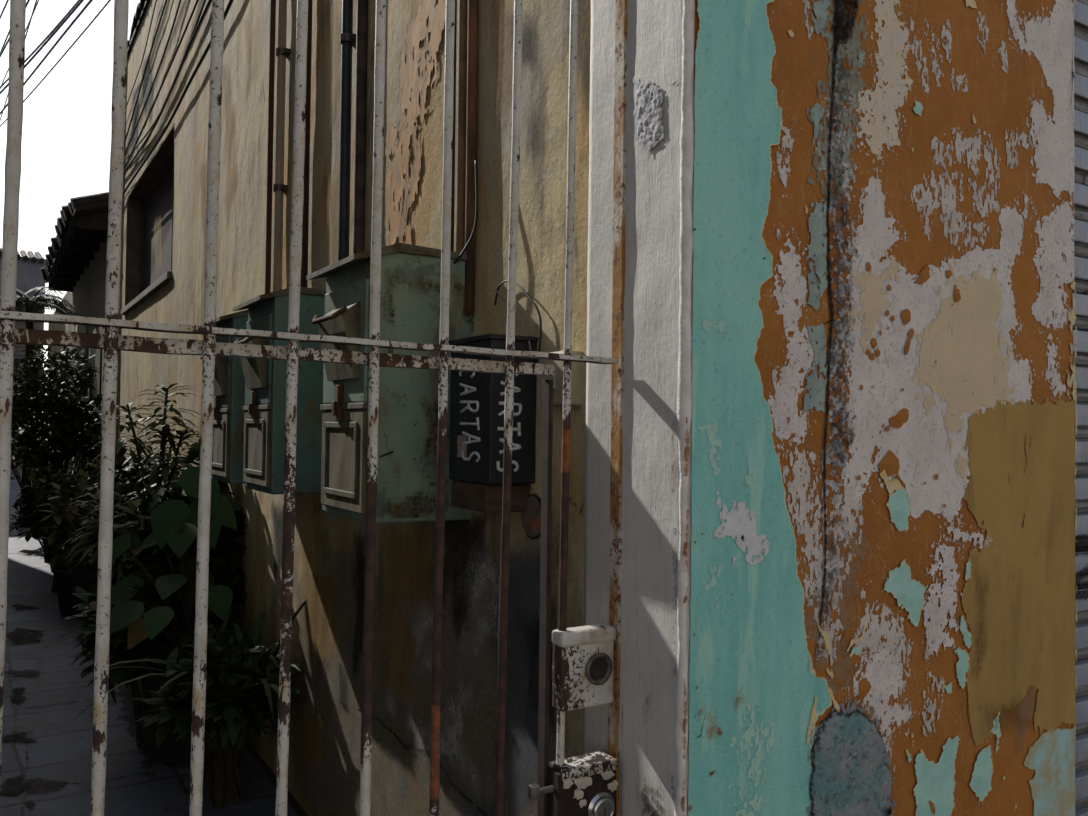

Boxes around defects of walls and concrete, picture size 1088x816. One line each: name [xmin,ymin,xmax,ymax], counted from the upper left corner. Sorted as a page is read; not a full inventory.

damp [832,0,859,44]
damp [271,503,283,575]
damp [293,515,560,816]
damp [826,146,854,480]
peeling [672,0,1077,816]